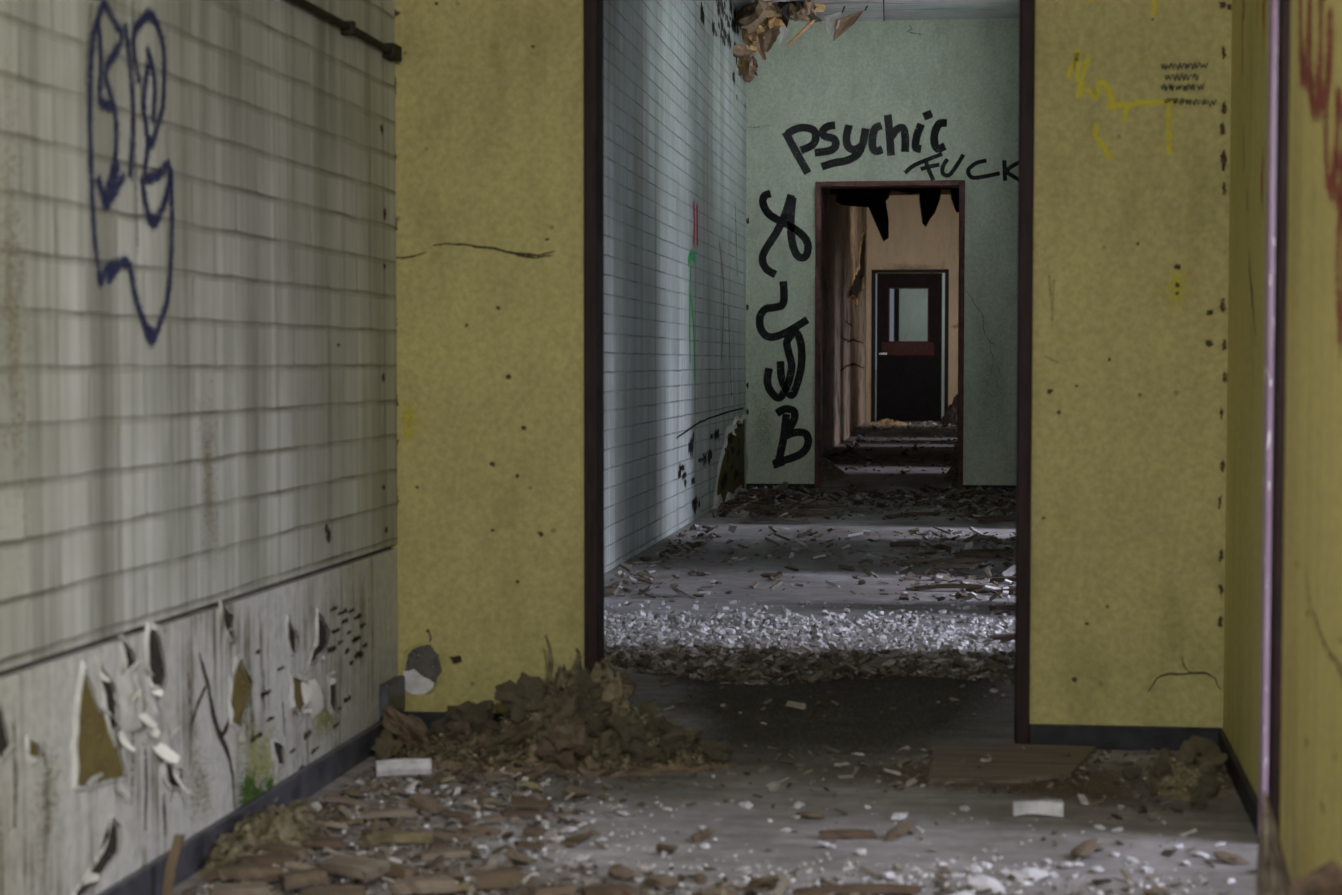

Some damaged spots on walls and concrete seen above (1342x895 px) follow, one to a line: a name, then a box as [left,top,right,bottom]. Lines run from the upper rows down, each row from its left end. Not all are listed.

peeling [825,5,868,41]
crack [396,243,555,259]
crack [1305,567,1342,681]
peeling [0,701,43,767]
peeling [71,621,167,798]
peeling [218,598,368,772]
flaking render [401,629,464,695]
crack [1147,656,1221,693]
peeling [160,760,184,794]
peeling [71,811,121,895]